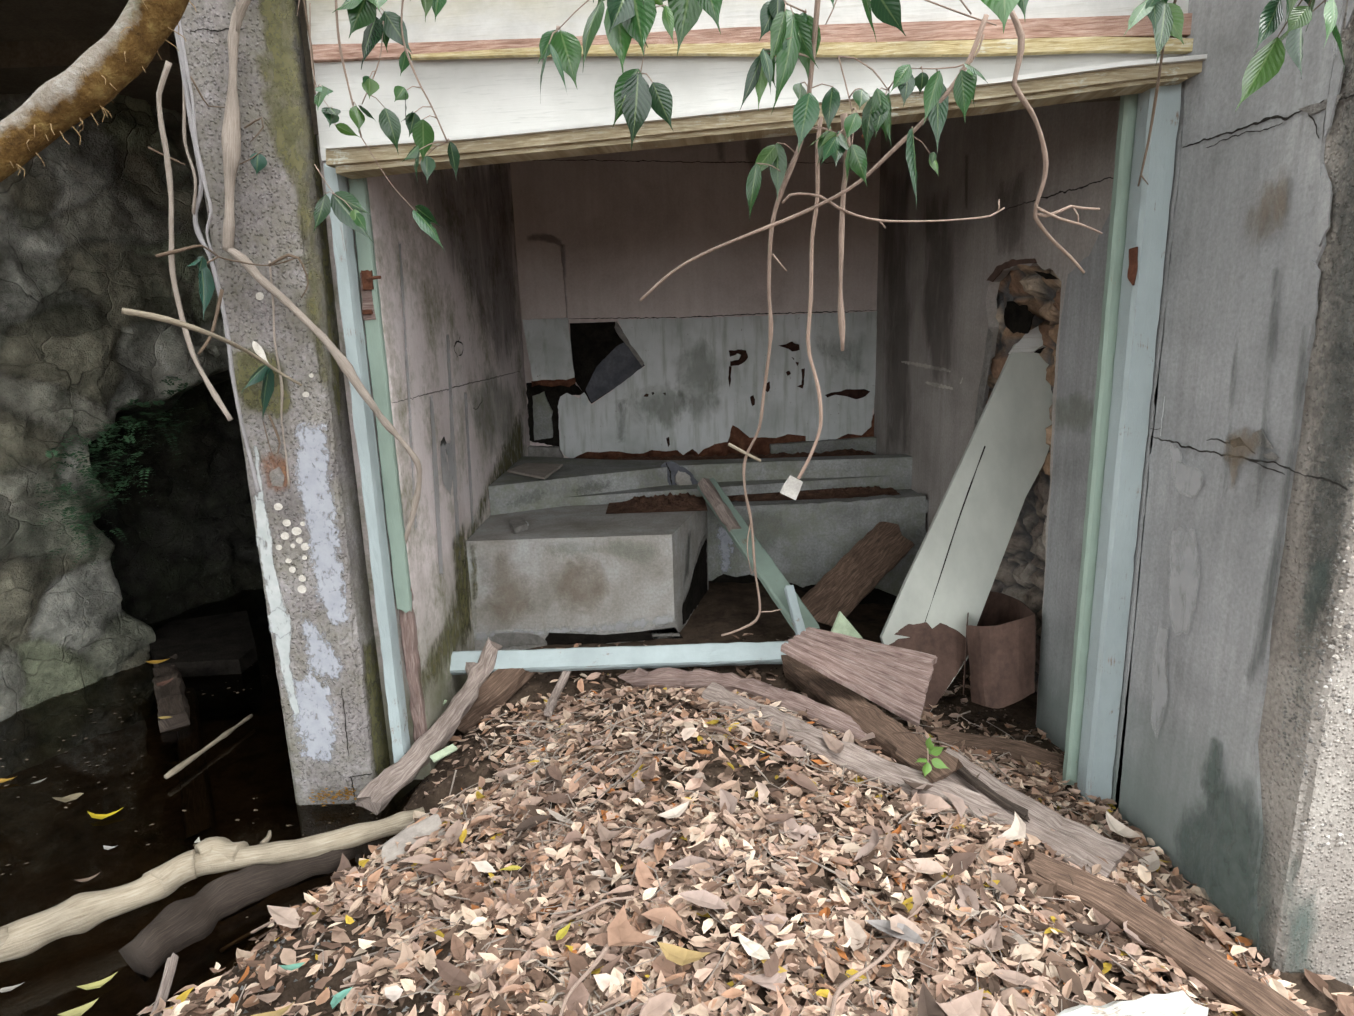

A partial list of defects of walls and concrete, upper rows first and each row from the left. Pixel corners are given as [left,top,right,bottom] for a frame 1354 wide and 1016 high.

crack [1182,93,1354,148]
leakage [259,0,341,423]
spalling [987,258,1057,282]
spalling [526,320,645,458]
spalling [973,301,1034,432]
crack [1152,429,1348,490]